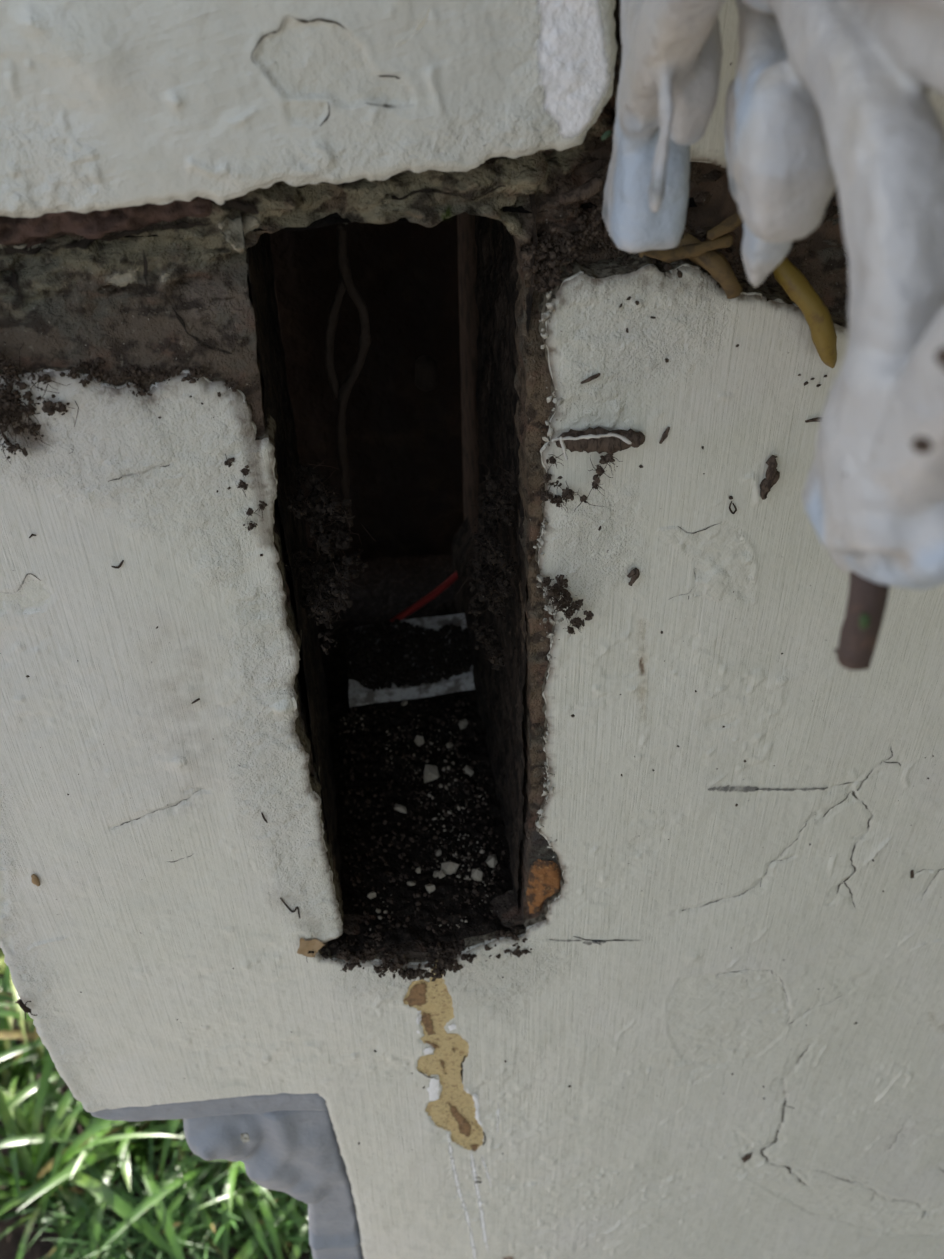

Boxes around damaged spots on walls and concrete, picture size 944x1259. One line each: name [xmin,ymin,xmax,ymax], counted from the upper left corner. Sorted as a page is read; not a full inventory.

spalling [687,162,726,207]
spalling [724,231,785,291]
spalling [786,184,849,322]
spalling [0,0,622,1151]
crack [682,748,901,911]
crack [760,1100,925,1218]